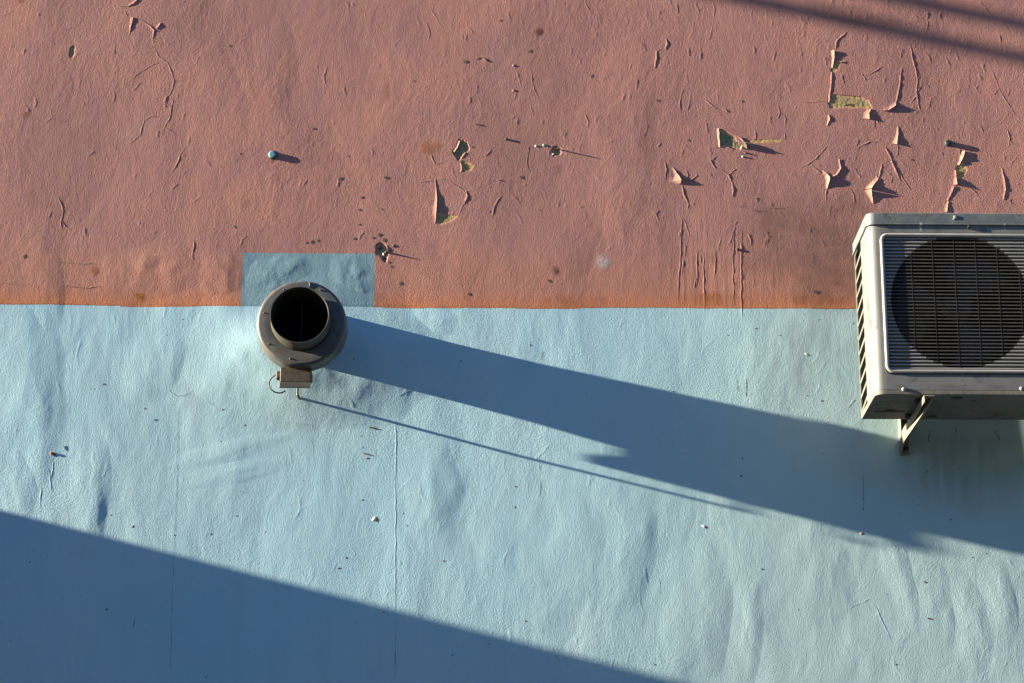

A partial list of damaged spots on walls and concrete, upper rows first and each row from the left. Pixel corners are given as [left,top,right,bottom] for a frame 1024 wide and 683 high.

peeling [805,31,902,126]
crack [131,45,193,172]
peeling [421,179,468,224]
spalling [453,140,473,172]
peeling [664,161,697,210]
spalling [716,128,747,157]
peeling [810,159,841,201]
peeling [864,163,882,204]
peeling [944,151,966,212]
crack [677,160,791,319]